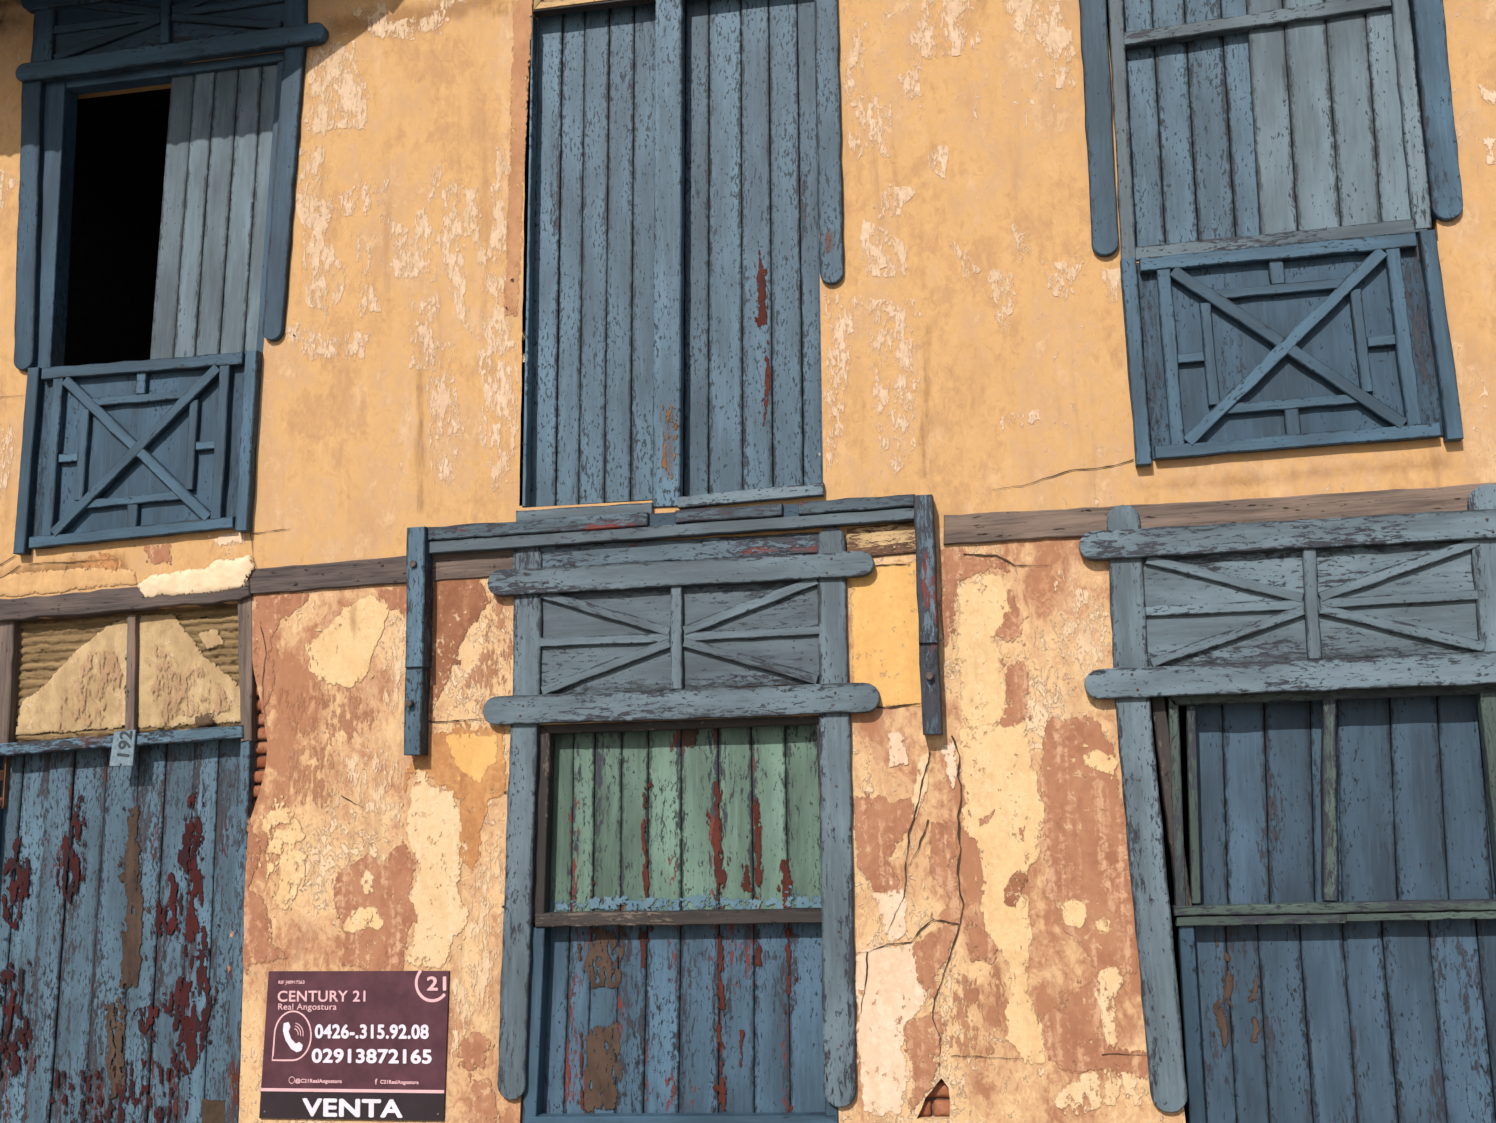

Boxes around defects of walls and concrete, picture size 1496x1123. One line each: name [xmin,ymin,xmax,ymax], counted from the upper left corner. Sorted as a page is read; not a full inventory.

peeling [842,0,983,159]
peeling [1002,0,1076,93]
flaking render [285,0,533,500]
peeling [860,183,916,277]
peeling [928,145,949,179]
peeling [949,223,1121,349]
peeling [819,293,921,474]
crack [992,459,1133,490]
crack [877,701,920,709]
peeling [0,578,513,1123]
crack [857,735,1024,1083]
flaking render [848,547,1149,1117]